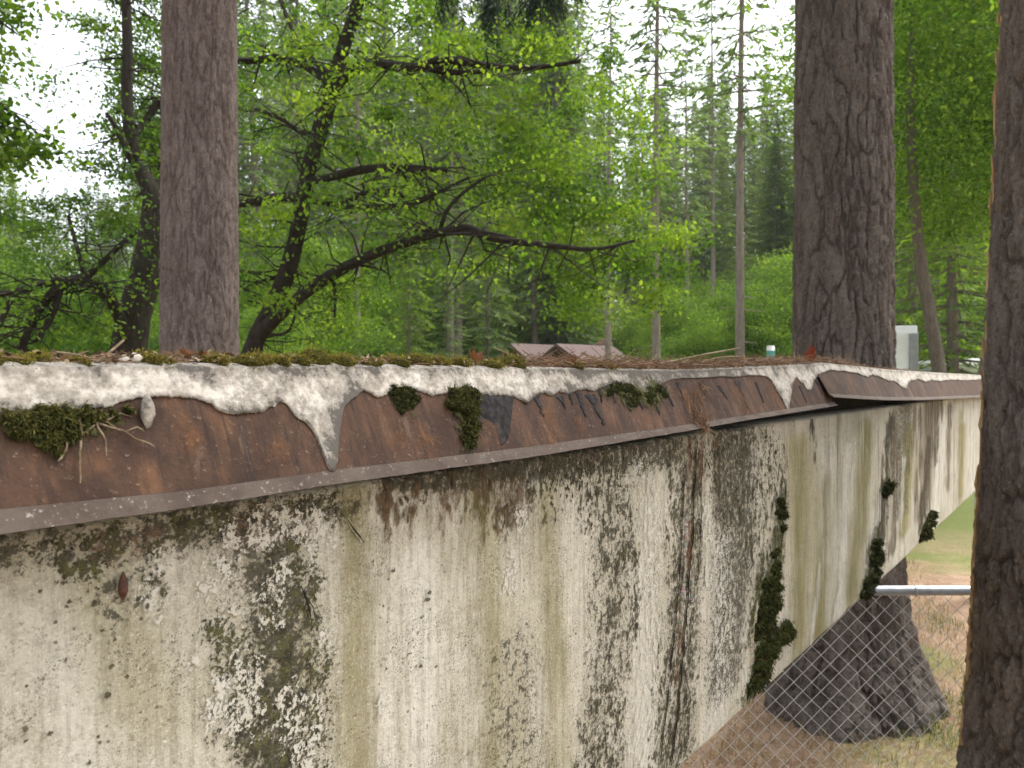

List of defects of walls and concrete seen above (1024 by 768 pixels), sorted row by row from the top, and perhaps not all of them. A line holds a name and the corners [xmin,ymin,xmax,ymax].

leakage [0,424,788,768]
crack [660,441,703,768]
leakage [876,400,973,560]